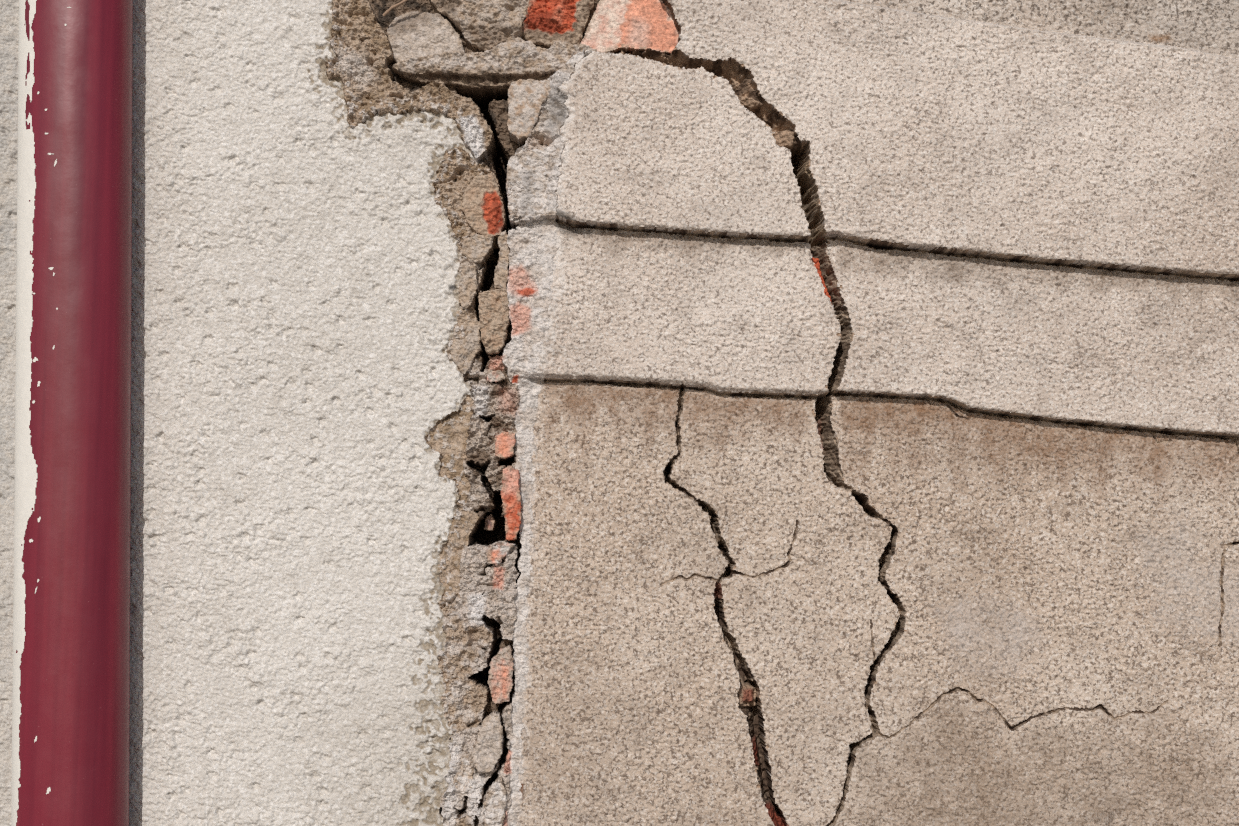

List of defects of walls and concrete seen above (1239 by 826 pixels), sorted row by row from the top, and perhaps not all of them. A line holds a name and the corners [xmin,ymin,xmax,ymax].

crack [454,87,522,372]
crack [478,413,496,423]
crack [466,453,518,546]
flaking render [325,0,681,826]
crack [543,47,1239,826]
crack [456,615,515,826]